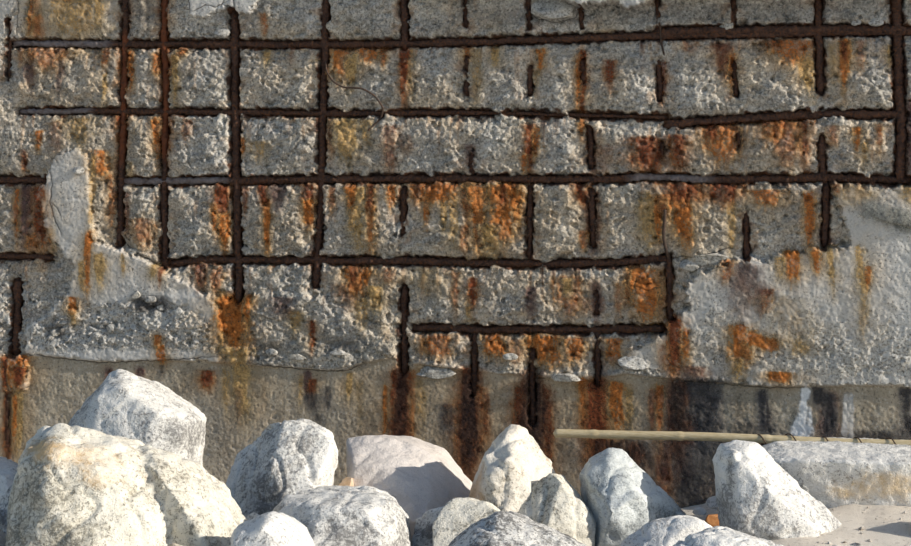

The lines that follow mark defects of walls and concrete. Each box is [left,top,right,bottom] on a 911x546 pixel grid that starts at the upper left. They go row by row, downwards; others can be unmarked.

rust [67,118,129,325]
spalling [0,0,911,387]
rust [410,181,526,257]
rust [0,354,31,459]
rust [194,264,253,421]
rust [382,367,426,437]
rust [452,367,490,482]
rust [482,333,586,467]
rust [576,377,634,458]
leakage [590,378,724,508]
leakage [756,389,776,446]
leakage [791,386,911,440]